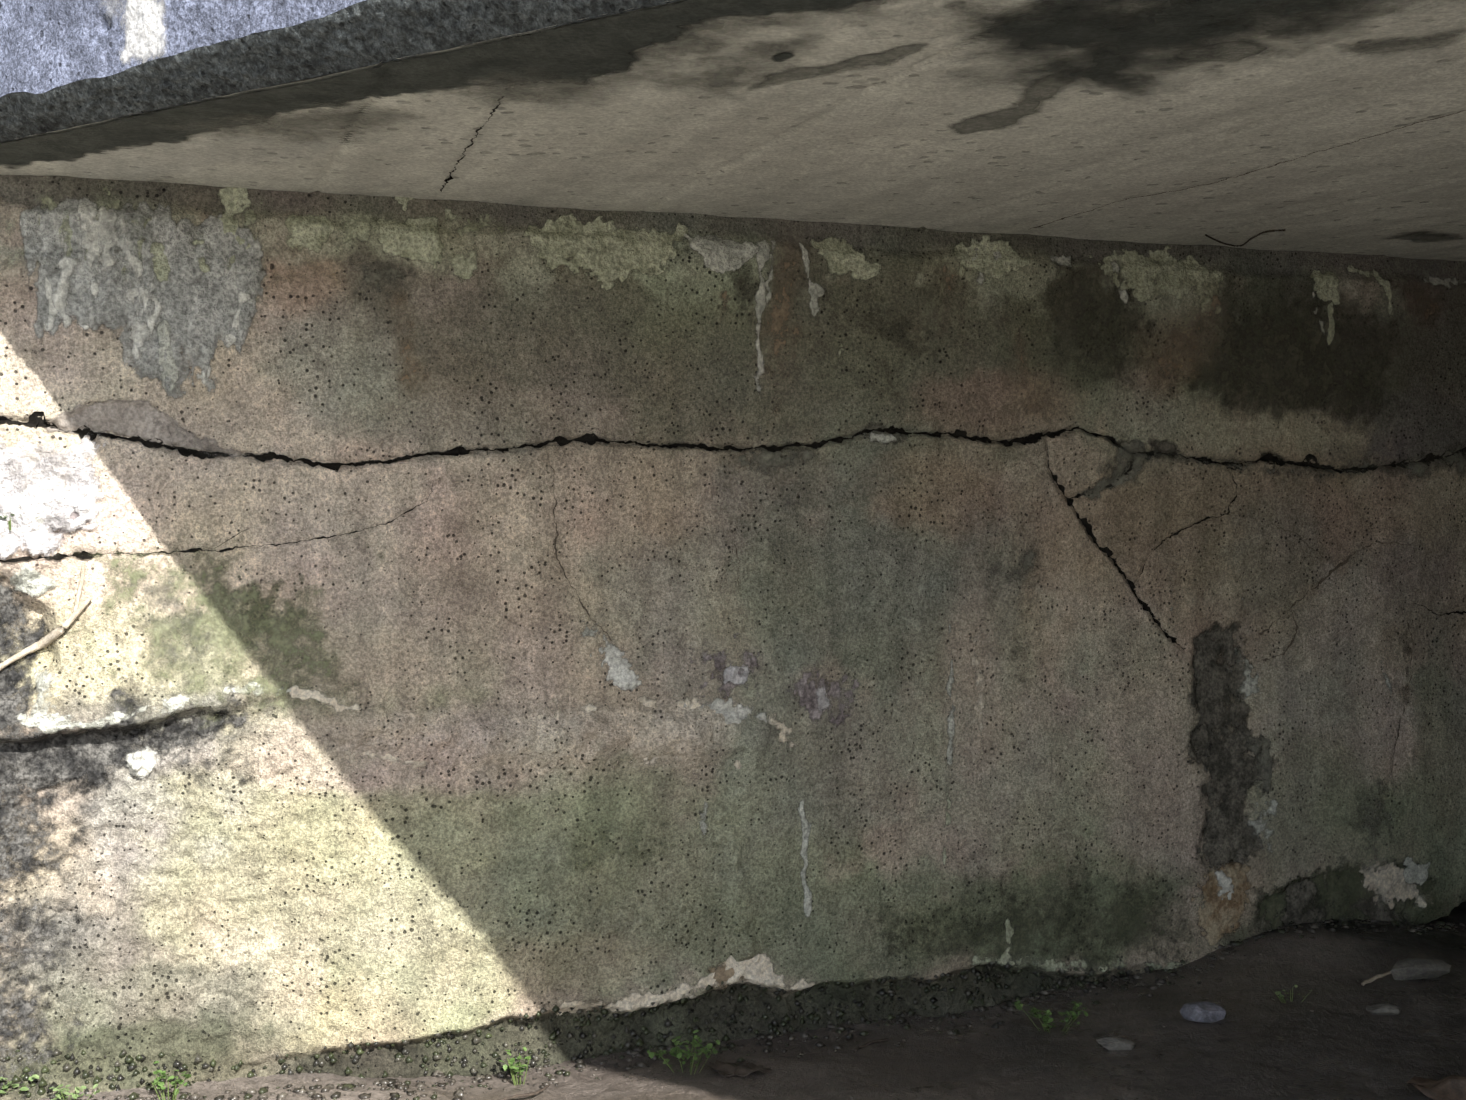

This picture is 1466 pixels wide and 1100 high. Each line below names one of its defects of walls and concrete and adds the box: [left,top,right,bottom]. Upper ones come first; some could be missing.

damp [0,0,926,169]
damp [952,0,1397,134]
damp [8,186,505,399]
damp [524,213,776,391]
damp [799,237,882,317]
damp [1050,245,1397,425]
crack [0,411,1466,662]
damp [17,671,190,734]
damp [126,749,156,778]
damp [286,685,361,712]
crack [1387,603,1466,793]
damp [556,953,827,1015]